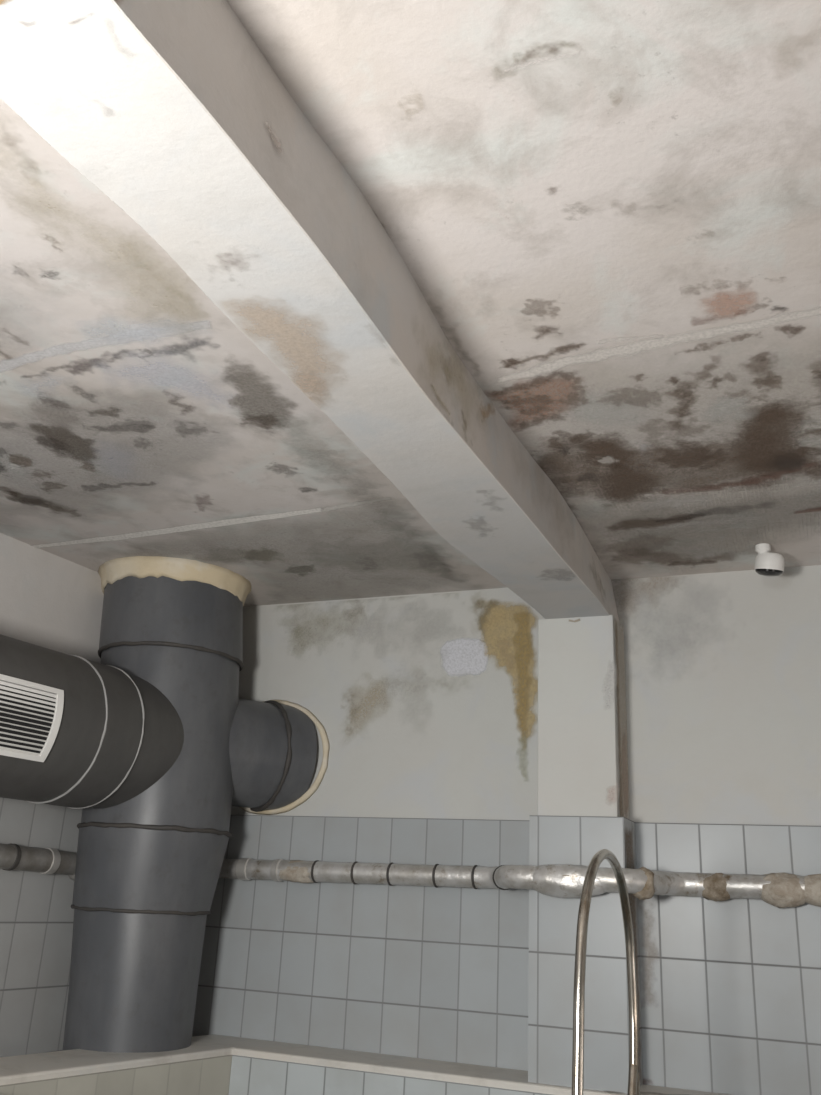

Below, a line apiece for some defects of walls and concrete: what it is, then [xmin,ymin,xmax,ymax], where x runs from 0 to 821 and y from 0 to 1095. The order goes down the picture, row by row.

leakage [71,359,101,373]
leakage [228,371,290,427]
leakage [32,425,94,468]
leakage [541,406,821,528]
leakage [8,492,71,512]
leakage [478,601,538,740]
corrosion [625,832,634,869]
corrosion [628,893,641,1079]